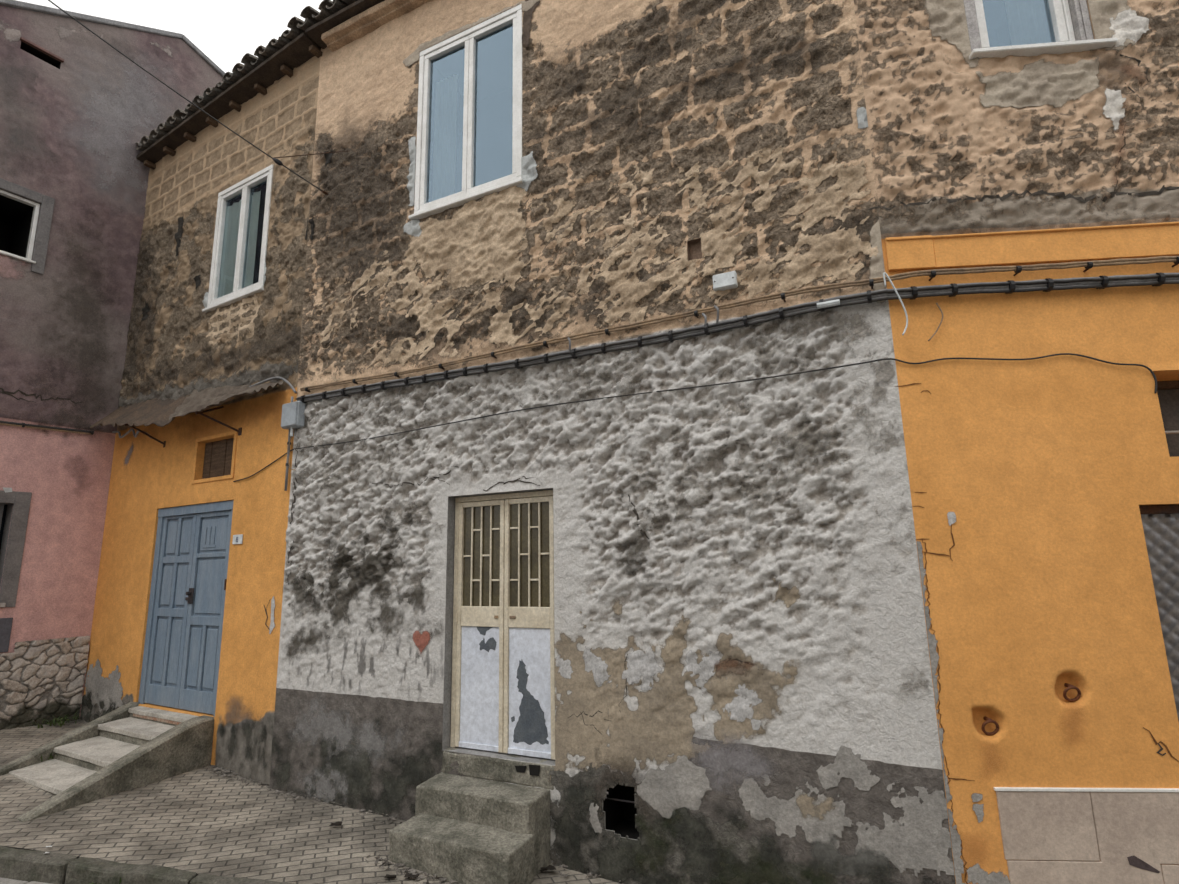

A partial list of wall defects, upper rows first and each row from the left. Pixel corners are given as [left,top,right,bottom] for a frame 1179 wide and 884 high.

spalling [120,0,1179,398]
crack [0,388,84,404]
peeling [849,346,905,452]
crack [483,476,540,491]
peeling [617,402,848,532]
damp [287,515,442,687]
peeling [85,659,123,713]
damp [294,702,384,765]
peeling [515,534,1010,884]
crack [1143,727,1179,762]
damp [305,770,347,800]